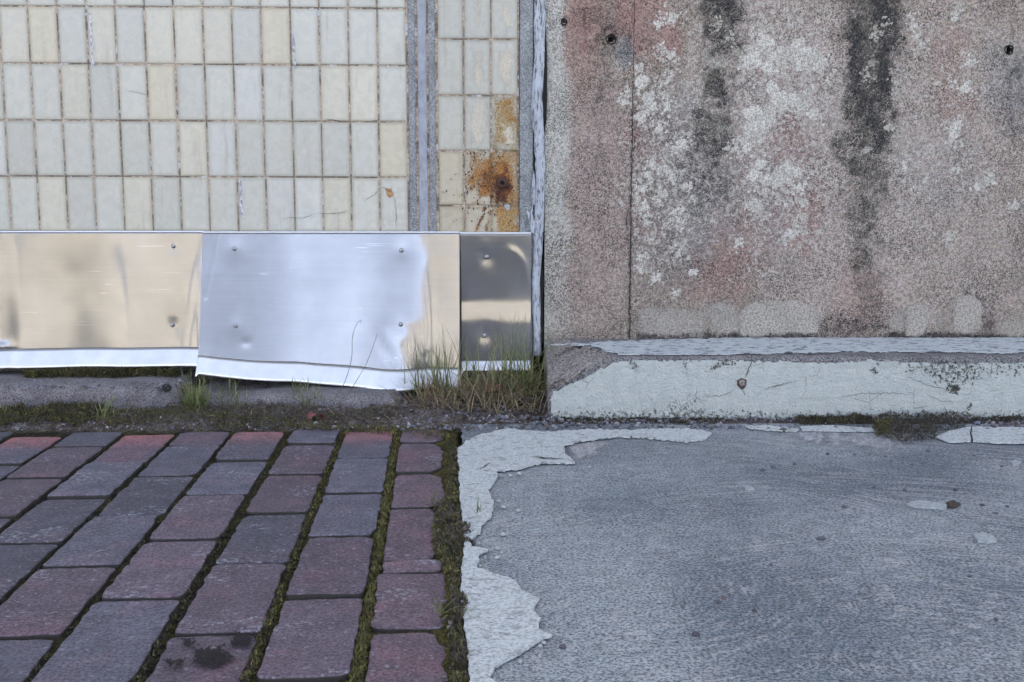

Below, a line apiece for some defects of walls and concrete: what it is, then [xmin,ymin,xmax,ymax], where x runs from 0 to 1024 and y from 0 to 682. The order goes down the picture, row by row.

rust [446,93,520,232]
damp [635,0,1024,339]
spalling [545,338,610,388]
peeling [744,425,908,453]
peeling [936,426,1024,444]
peeling [455,425,714,682]